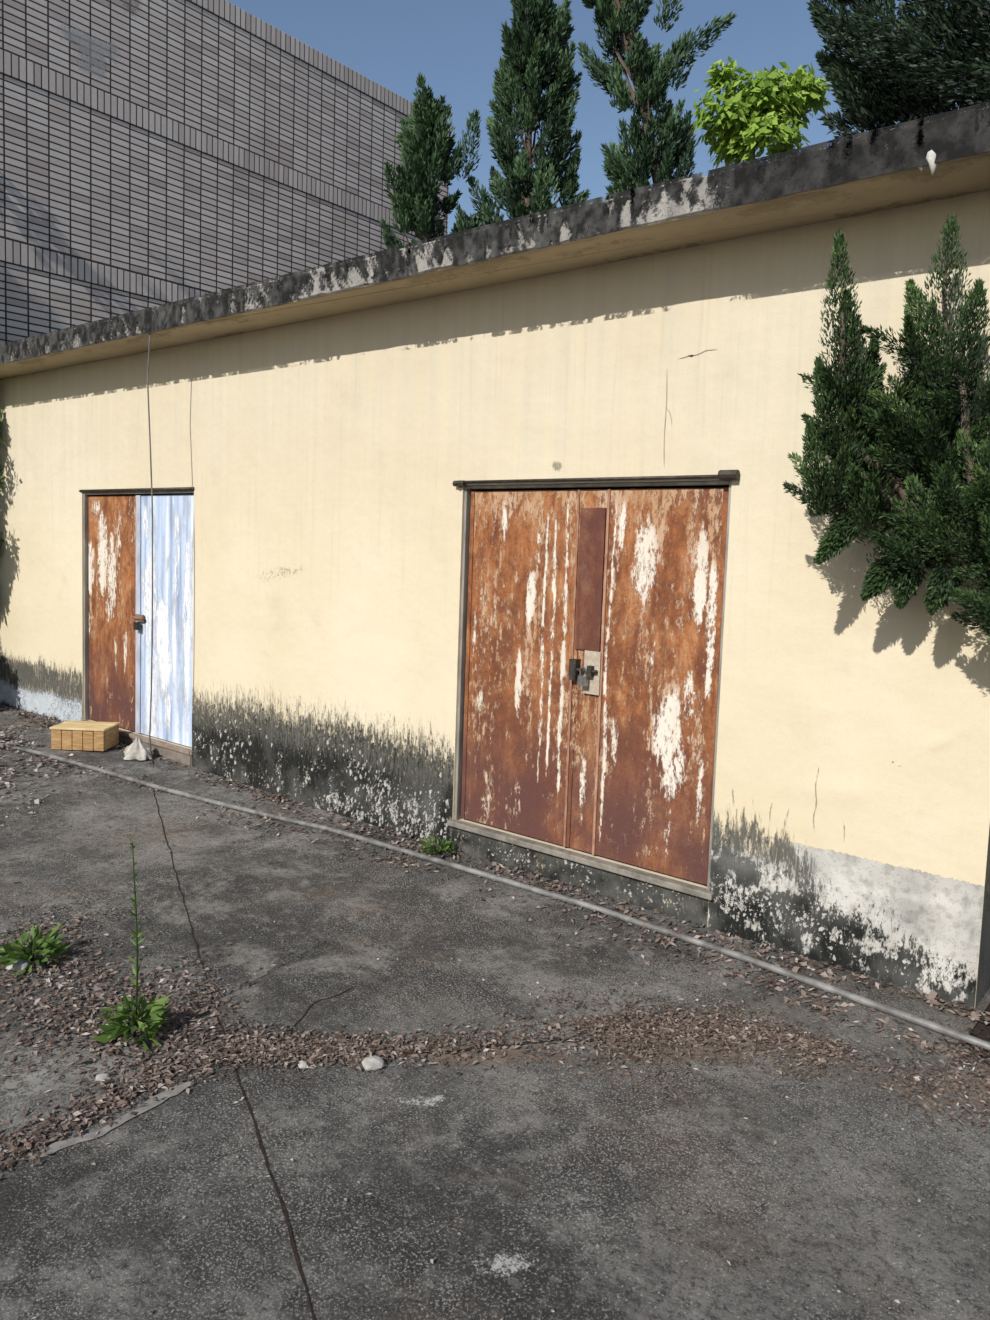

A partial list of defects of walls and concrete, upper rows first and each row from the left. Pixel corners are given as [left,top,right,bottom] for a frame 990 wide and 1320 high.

leakage [0,101,990,364]
leakage [0,647,82,722]
leakage [192,684,990,1008]
crack [0,773,862,1320]